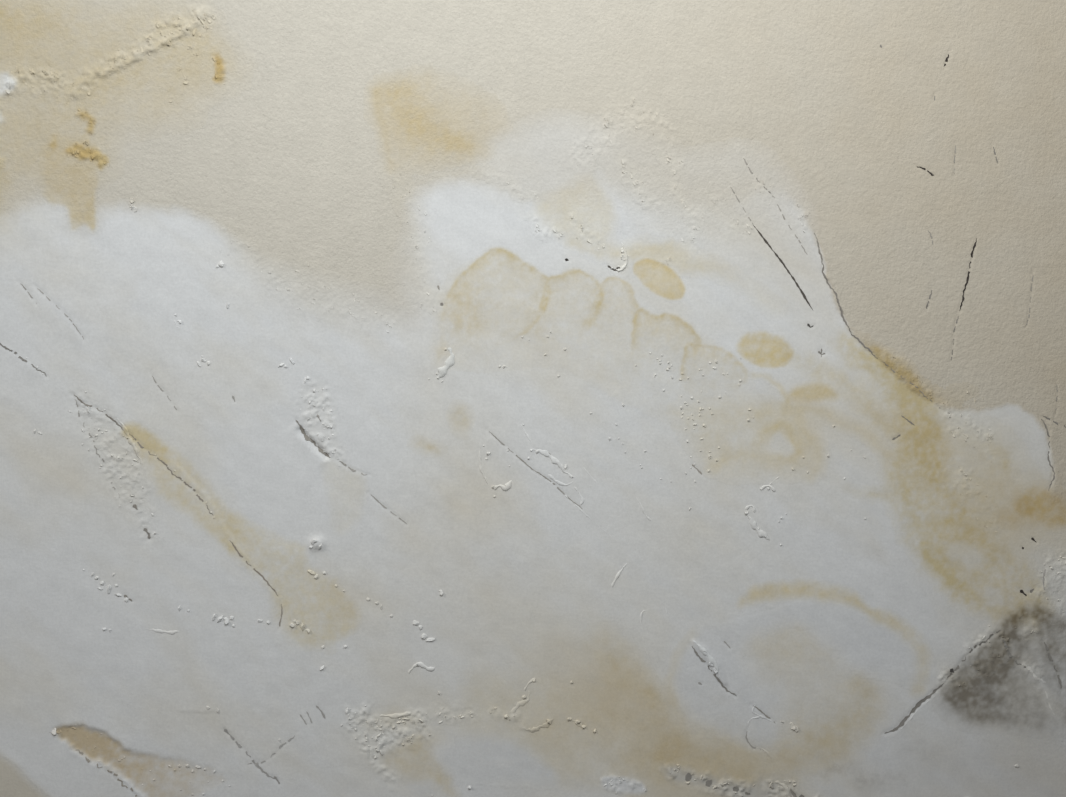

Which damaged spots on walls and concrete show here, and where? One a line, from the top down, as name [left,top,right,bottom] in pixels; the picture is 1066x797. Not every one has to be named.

flaking render [476,107,686,241]
flaking render [373,137,851,361]
crack [0,343,46,375]
crack [76,396,215,518]
water stain [130,419,370,656]
crack [230,541,283,626]
flaking render [0,198,1066,797]
water stain [428,171,1066,742]
water stain [455,619,894,797]
crack [885,630,1000,733]